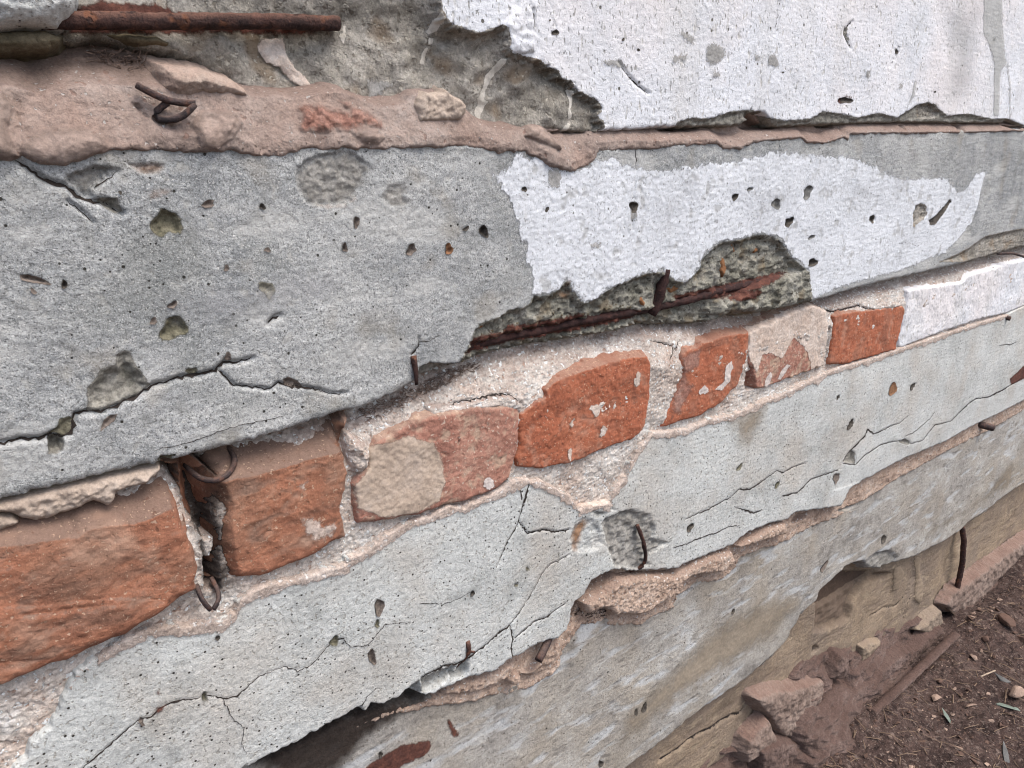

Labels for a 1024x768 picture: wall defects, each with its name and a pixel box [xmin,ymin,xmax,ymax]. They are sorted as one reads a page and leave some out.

corrosion [77,0,181,13]
peeling [706,42,726,78]
spalling [663,102,1024,131]
peeling [418,150,1024,375]
corrosion [666,244,784,301]
corrosion [463,297,645,360]
crack [0,358,348,450]
crack [673,379,1022,548]
crack [498,479,569,563]
crack [422,557,564,677]
spalling [814,551,895,626]
crack [83,590,473,768]